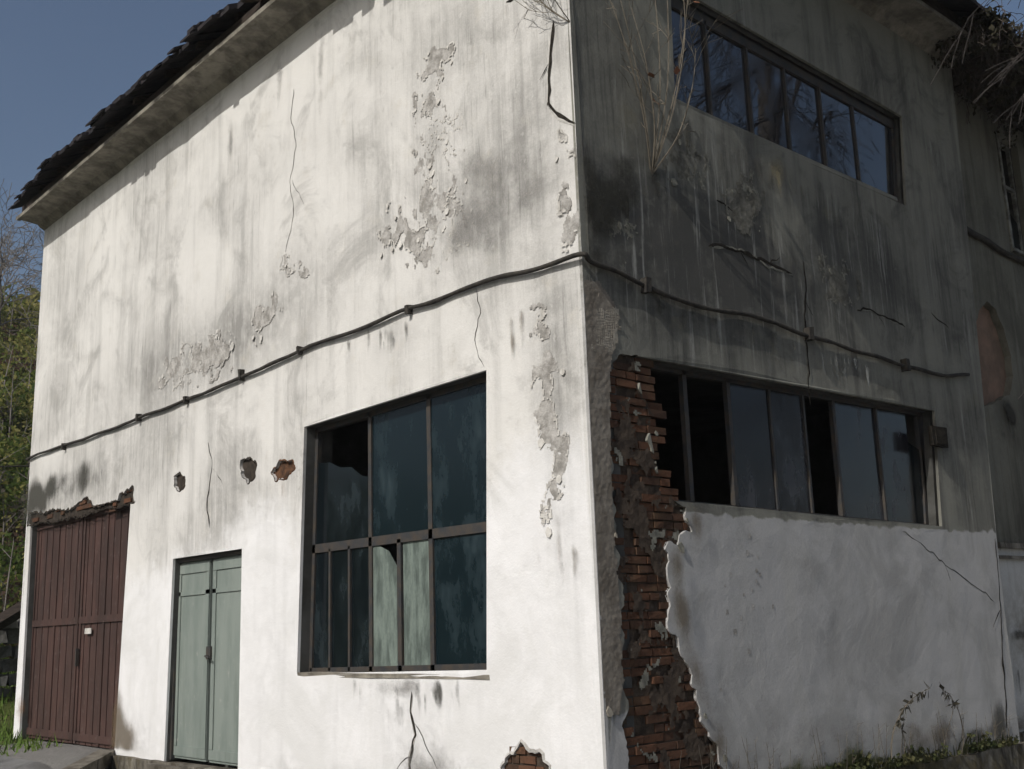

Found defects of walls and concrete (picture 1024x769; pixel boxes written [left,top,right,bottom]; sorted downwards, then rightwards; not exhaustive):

flaking render [376,41,473,274]
damp [584,157,636,233]
crack [709,243,813,405]
flaking render [529,302,570,538]
spalling [174,472,186,492]
spalling [240,457,257,484]
spalling [271,459,296,482]
flaking render [584,279,728,769]
crack [906,532,1007,728]
crack [397,691,437,769]
flaking render [500,739,551,769]